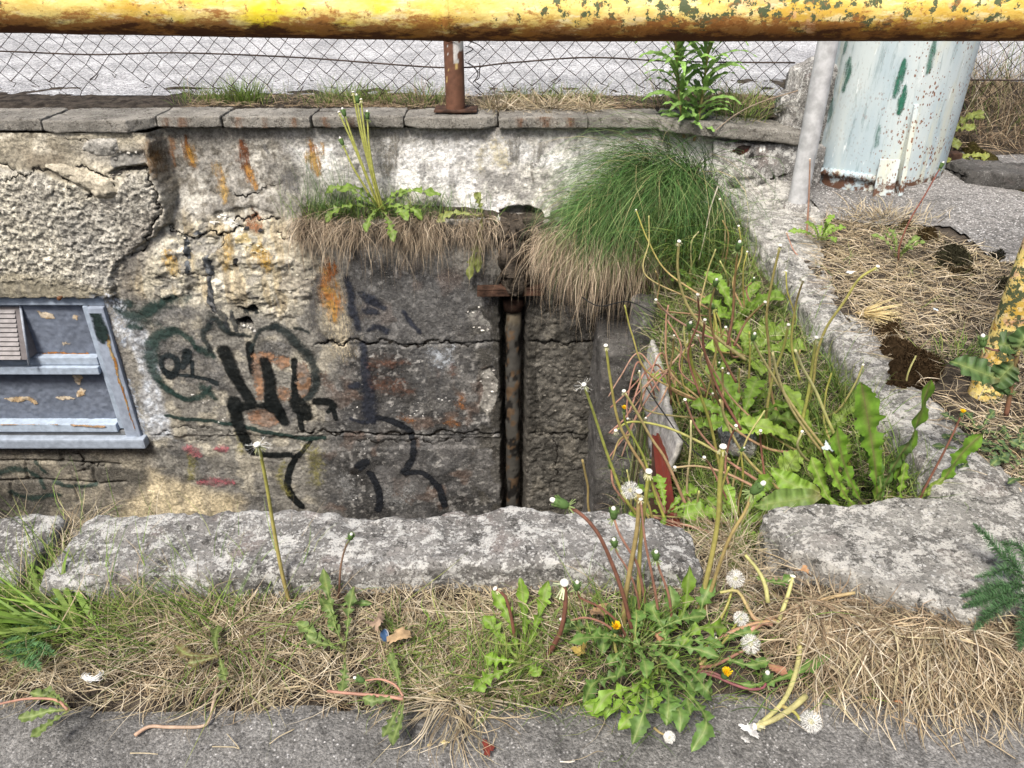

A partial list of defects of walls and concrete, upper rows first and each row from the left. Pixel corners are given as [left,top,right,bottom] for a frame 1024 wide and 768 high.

spalling [110,151,148,178]
rust [169,135,196,167]
rust [238,140,258,190]
crack [131,166,300,278]
crack [315,338,483,348]
crack [540,339,592,347]
crack [297,428,495,444]